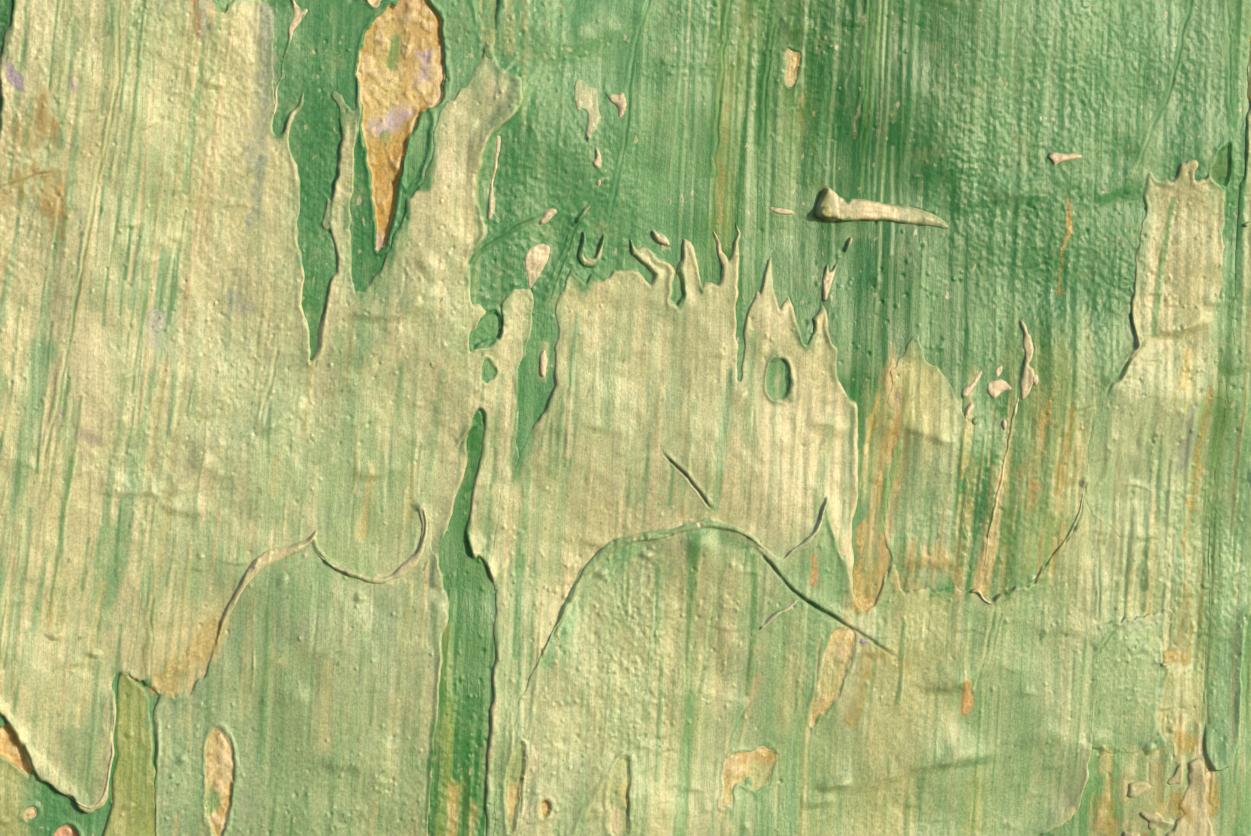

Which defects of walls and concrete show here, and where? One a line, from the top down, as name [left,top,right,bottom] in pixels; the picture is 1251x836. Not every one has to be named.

crack [0,165,59,191]
crack [35,0,123,494]
peeling [1047,152,1082,166]
crack [1136,0,1237,161]
peeling [1230,164,1251,344]
peeling [0,0,550,836]
peeling [485,159,1226,836]
peeling [1165,373,1251,836]
crack [1240,619,1251,729]